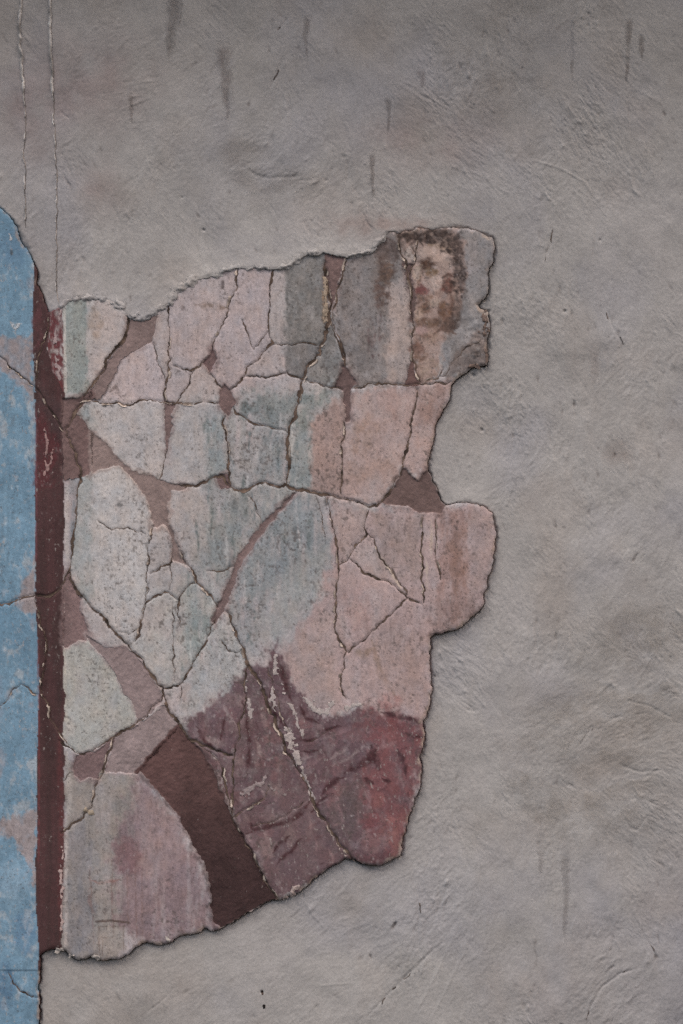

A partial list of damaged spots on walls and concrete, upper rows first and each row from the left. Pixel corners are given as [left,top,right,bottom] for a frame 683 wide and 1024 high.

peeling [53,310,62,381]
peeling [43,427,53,476]
crack [0,0,481,898]
peeling [268,654,362,800]
peeling [240,775,273,796]